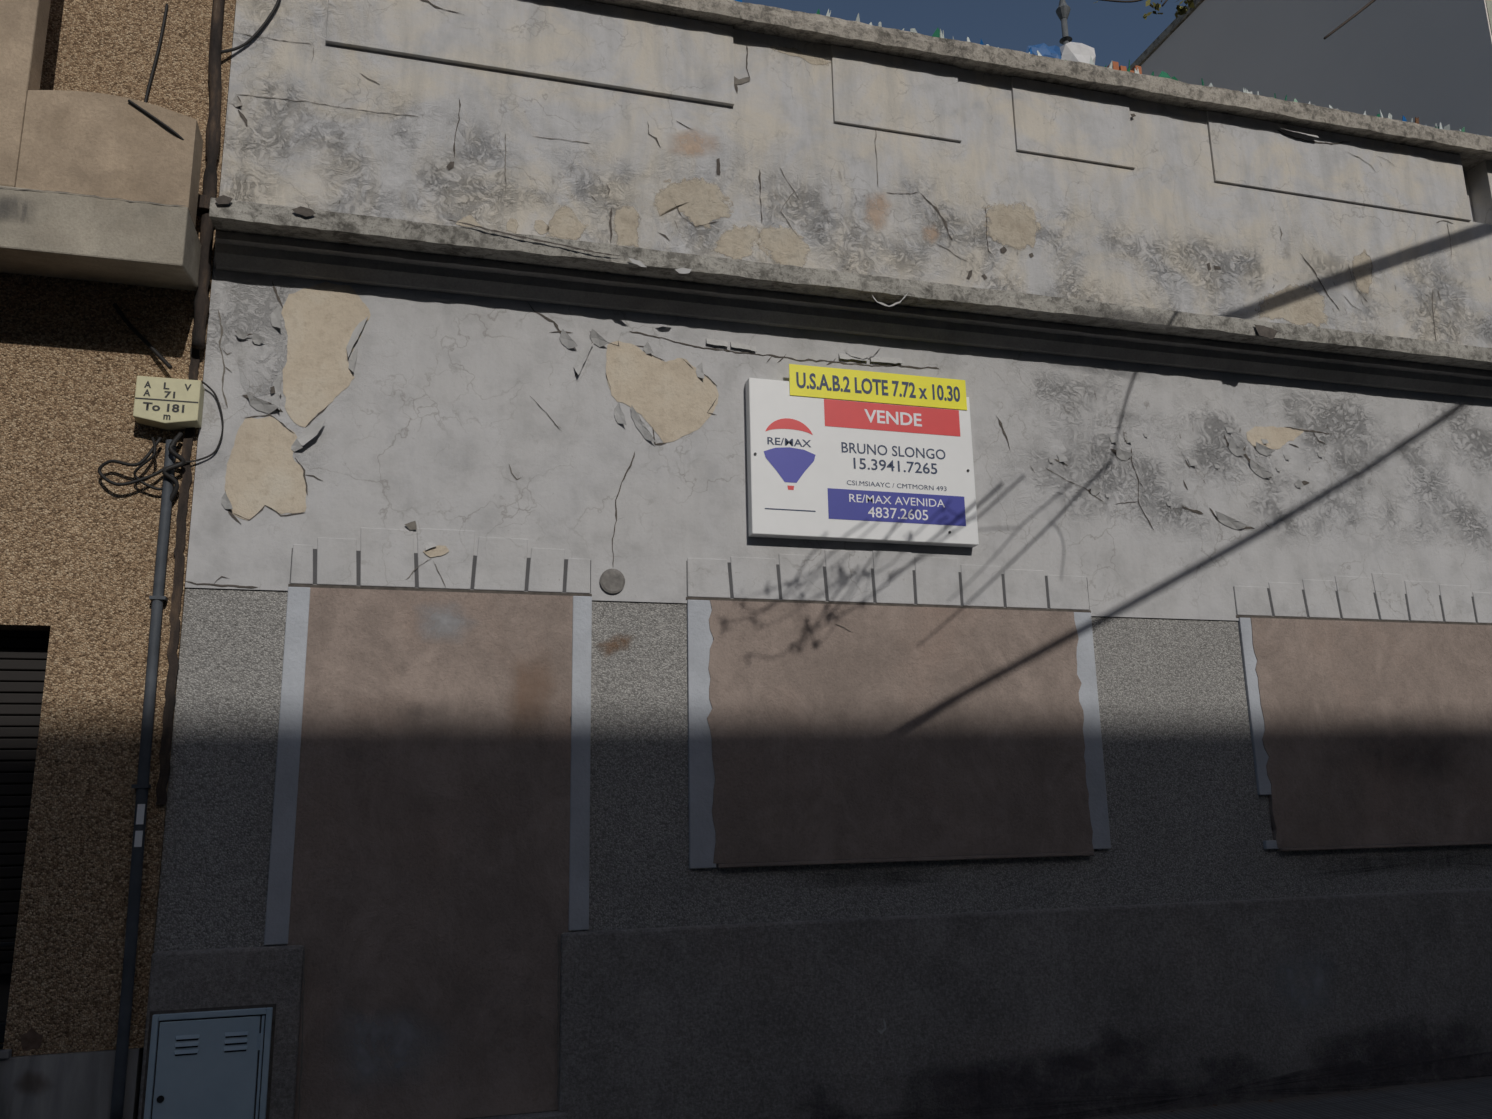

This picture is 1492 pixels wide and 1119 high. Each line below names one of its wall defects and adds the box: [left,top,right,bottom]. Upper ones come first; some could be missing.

peeling [654,158,733,229]
peeling [609,206,646,267]
peeling [758,226,811,267]
peeling [982,202,1042,257]
peeling [1254,284,1328,339]
peeling [221,282,371,524]
peeling [590,329,719,445]
crack [612,452,635,562]